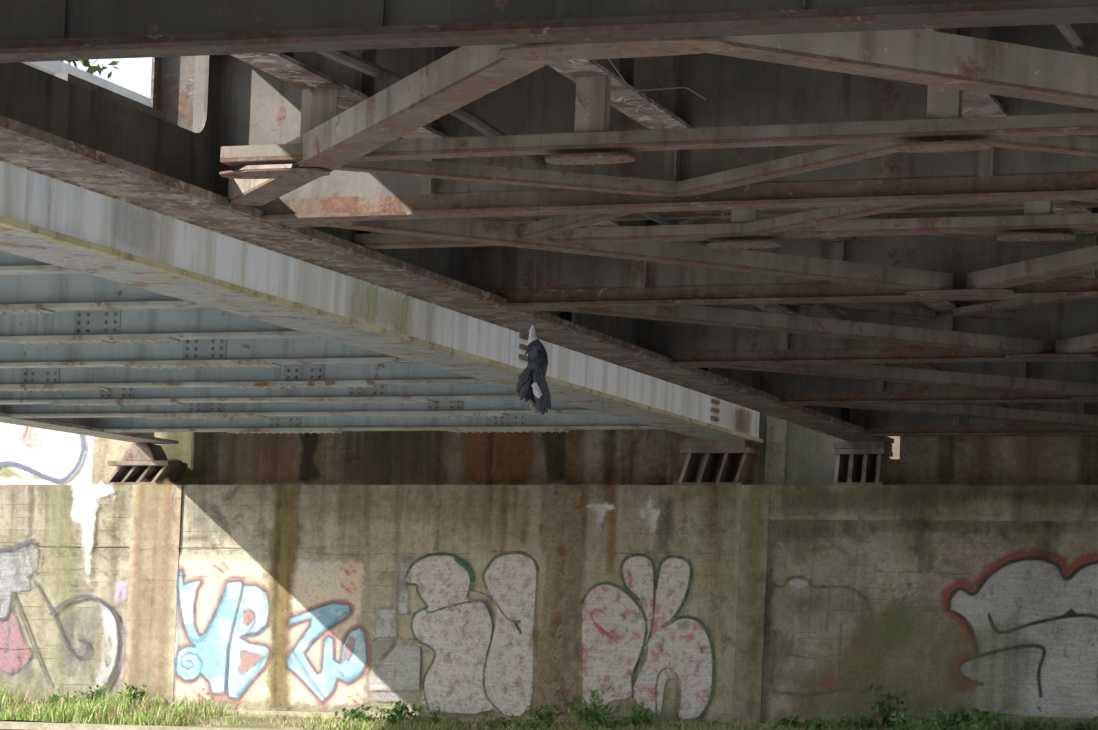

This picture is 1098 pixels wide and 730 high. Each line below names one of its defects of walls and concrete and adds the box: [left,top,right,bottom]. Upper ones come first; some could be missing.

damp [120,201,171,251]
rust [463,432,532,489]
damp [71,482,114,568]
damp [266,433,319,706]